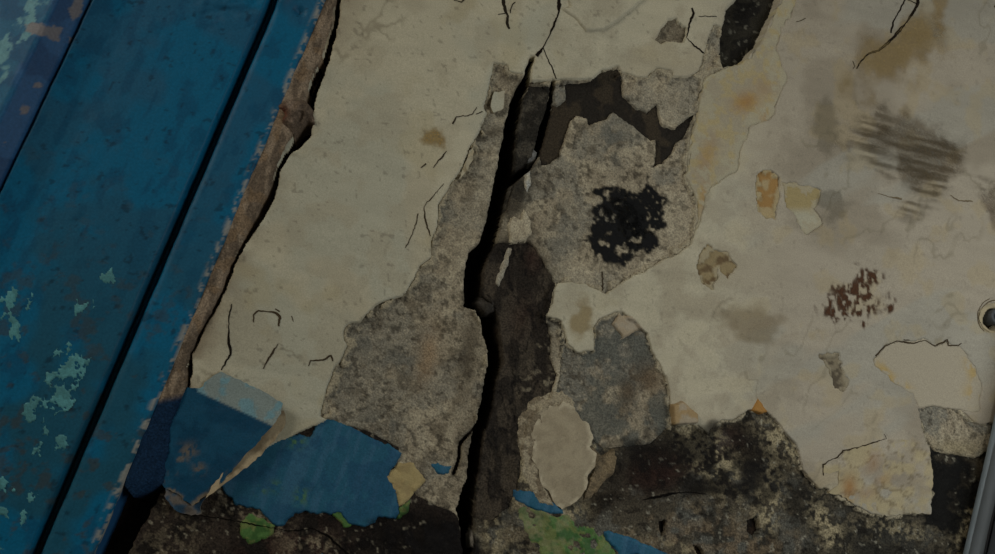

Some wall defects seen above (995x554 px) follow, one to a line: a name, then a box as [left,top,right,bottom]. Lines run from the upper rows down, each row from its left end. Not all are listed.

crack [853,0,920,69]
crack [230,0,341,279]
mould [586,176,667,266]
peeling [0,287,33,342]
crack [221,304,294,370]
flaking render [128,64,524,554]
crack [452,0,562,554]
flaking render [468,0,993,554]
rust [824,269,893,327]
peeling [22,341,90,457]
mould [670,423,778,503]
damp [923,449,982,547]